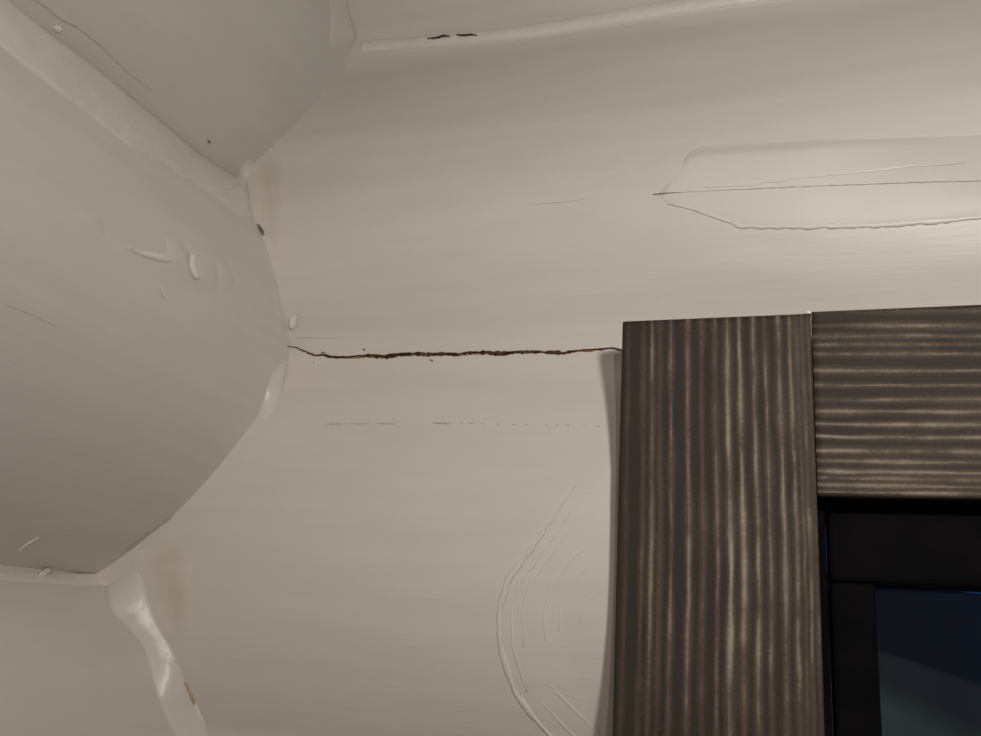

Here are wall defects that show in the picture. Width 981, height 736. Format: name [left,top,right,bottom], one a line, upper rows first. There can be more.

crack [428,32,477,40]
crack [291,335,622,363]